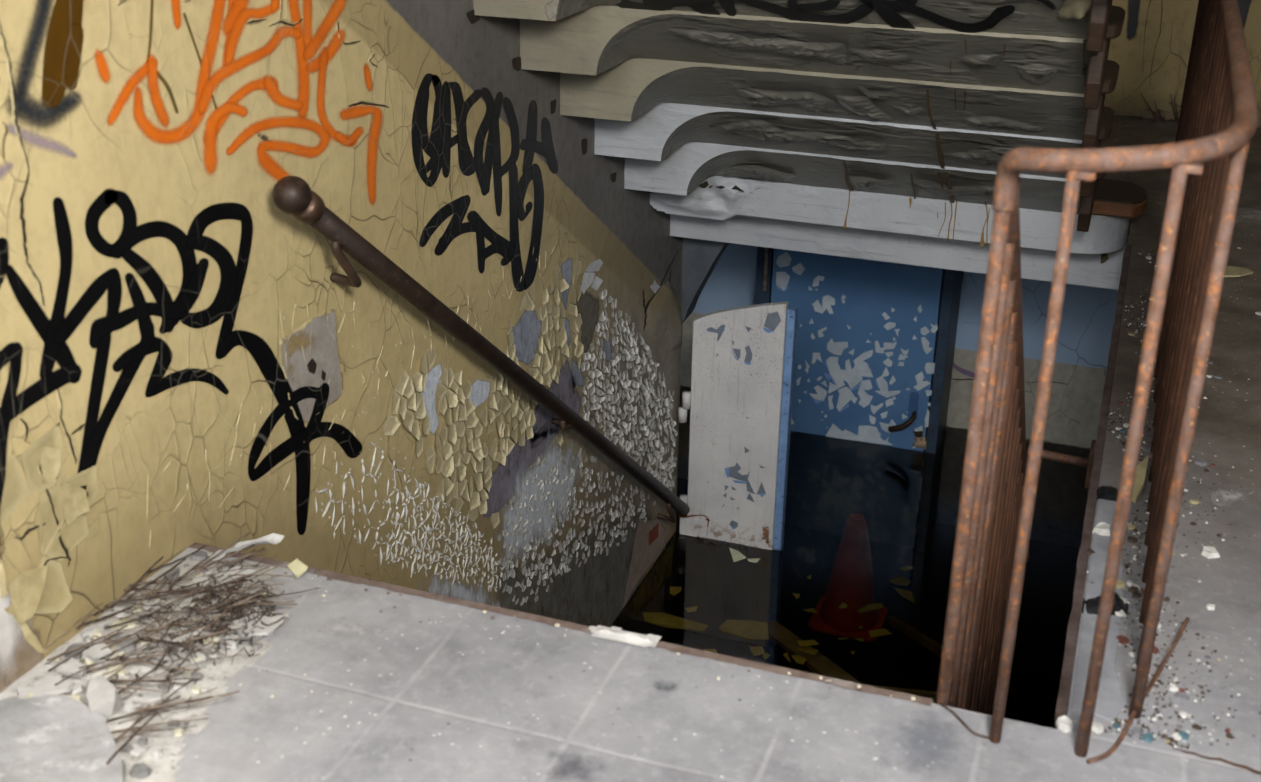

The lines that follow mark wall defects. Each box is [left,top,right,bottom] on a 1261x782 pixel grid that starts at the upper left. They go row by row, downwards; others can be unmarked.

crack [247,0,304,27]
crack [336,22,378,67]
crack [348,100,389,108]
crack [0,24,45,306]
peeling [706,312,781,365]
peeling [776,252,938,445]
crack [14,389,88,566]
peeling [279,300,665,616]
peeling [721,447,766,529]
peeling [0,425,99,693]
peeling [642,605,819,665]
crack [1173,748,1261,775]